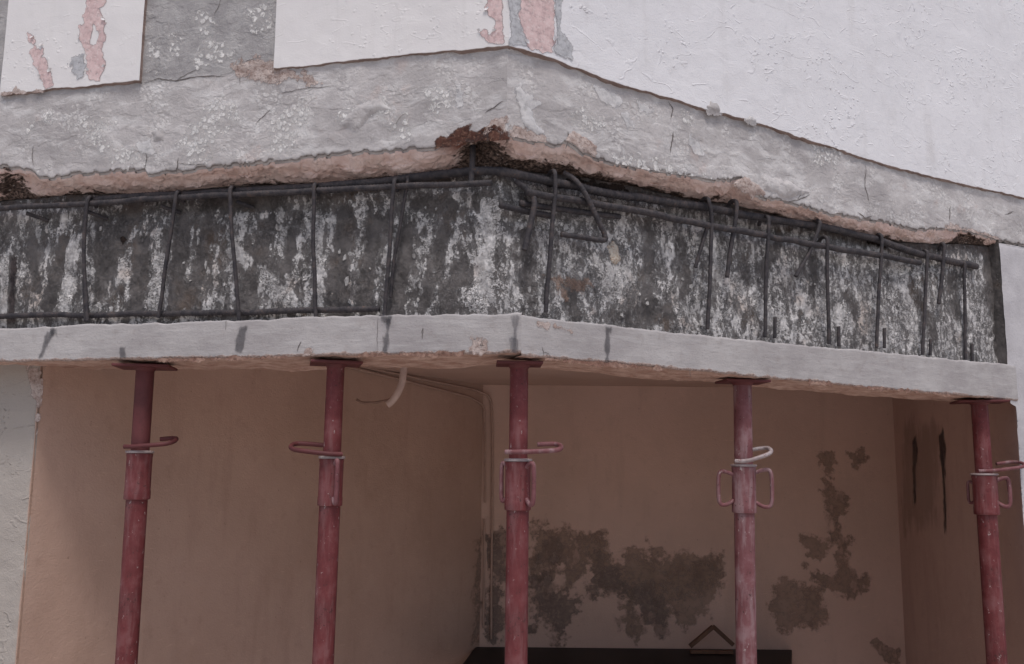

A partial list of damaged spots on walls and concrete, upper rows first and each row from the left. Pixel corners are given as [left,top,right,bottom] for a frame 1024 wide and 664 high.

peeling [1,32,54,96]
peeling [67,0,106,81]
peeling [477,0,573,60]
rust [435,124,510,150]
spalling [0,116,1007,364]
leakage [472,527,506,645]
leakage [528,520,725,646]
leakage [766,447,870,634]